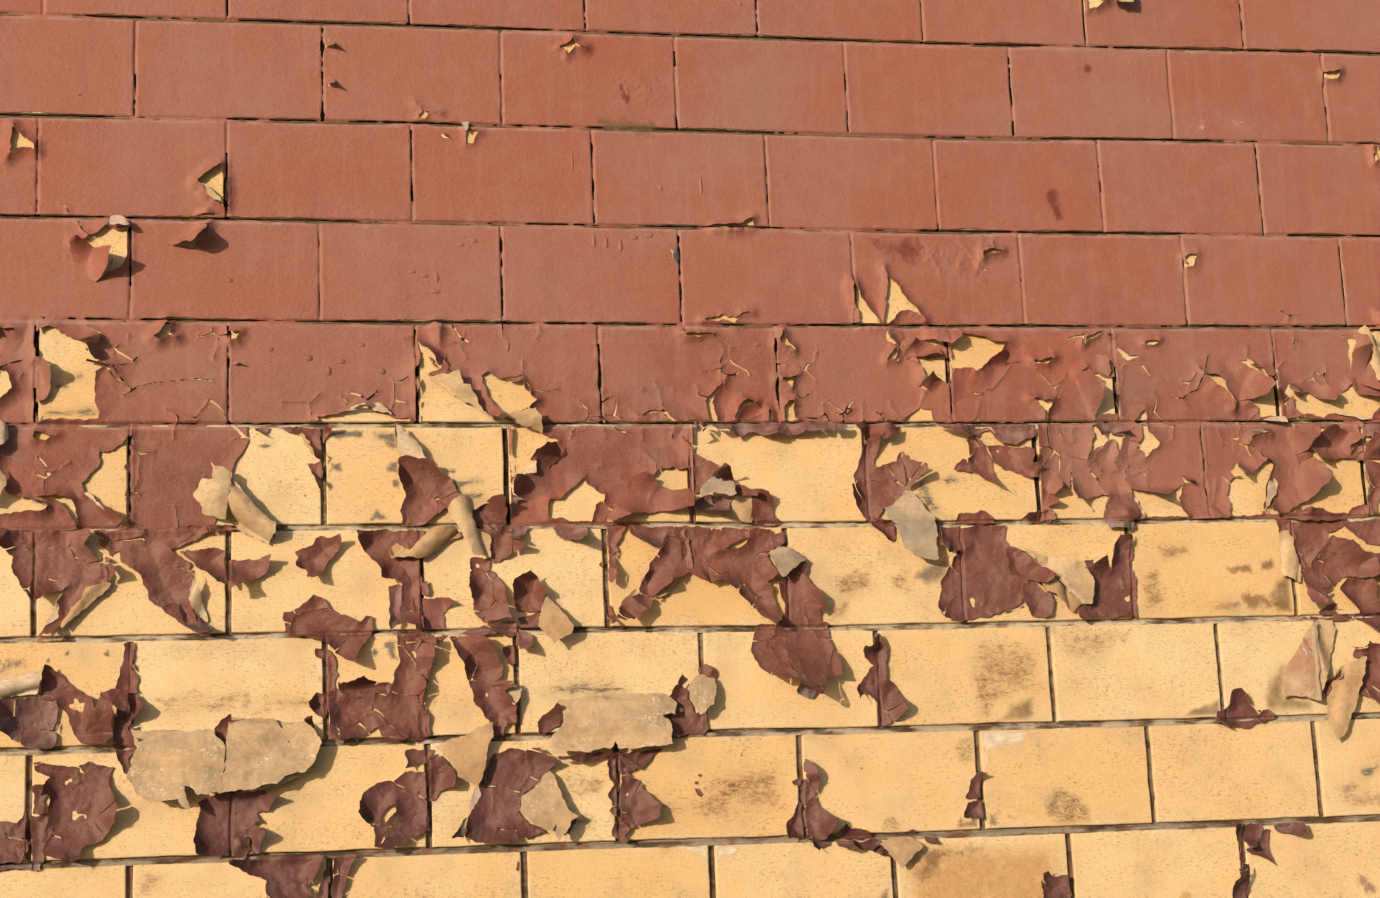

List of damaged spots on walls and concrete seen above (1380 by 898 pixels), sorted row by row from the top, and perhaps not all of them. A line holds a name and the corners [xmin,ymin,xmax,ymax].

peeling [68,213,142,285]
peeling [169,153,238,253]
peeling [0,642,143,871]
peeling [0,308,271,636]
peeling [193,790,356,898]
peeling [255,316,843,849]
peeling [622,299,929,541]
peeling [786,759,889,857]
peeling [857,633,907,726]
peeling [840,254,1201,622]
peeling [1232,822,1307,898]
peeling [1193,304,1380,704]